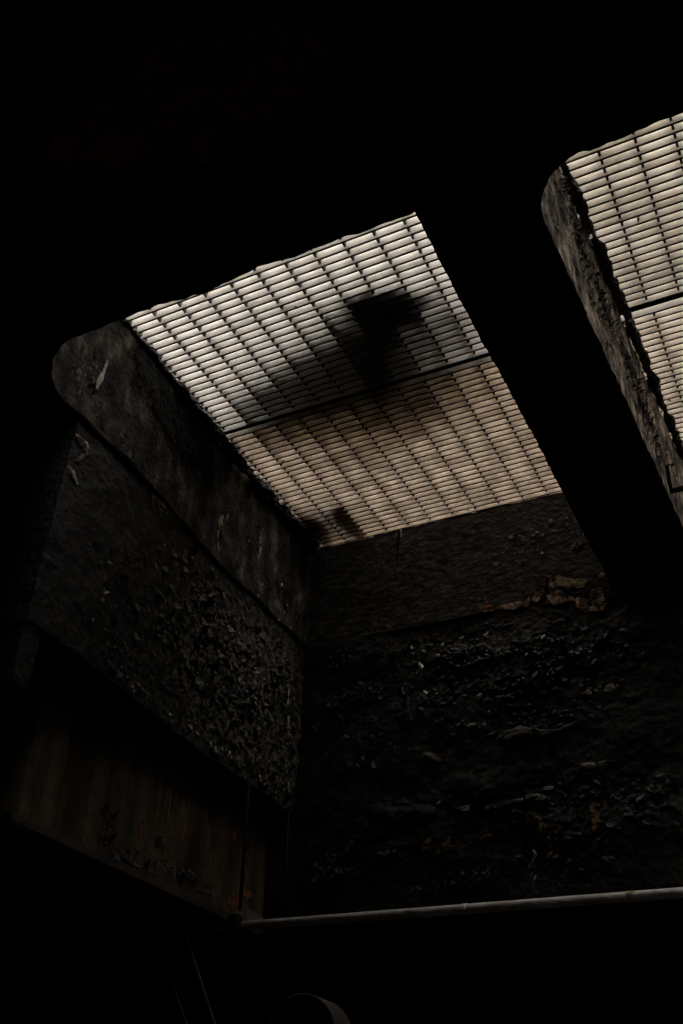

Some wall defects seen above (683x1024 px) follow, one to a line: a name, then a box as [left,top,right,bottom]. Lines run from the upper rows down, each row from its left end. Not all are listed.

spalling [552,170,678,484]
peeling [369,572,645,746]